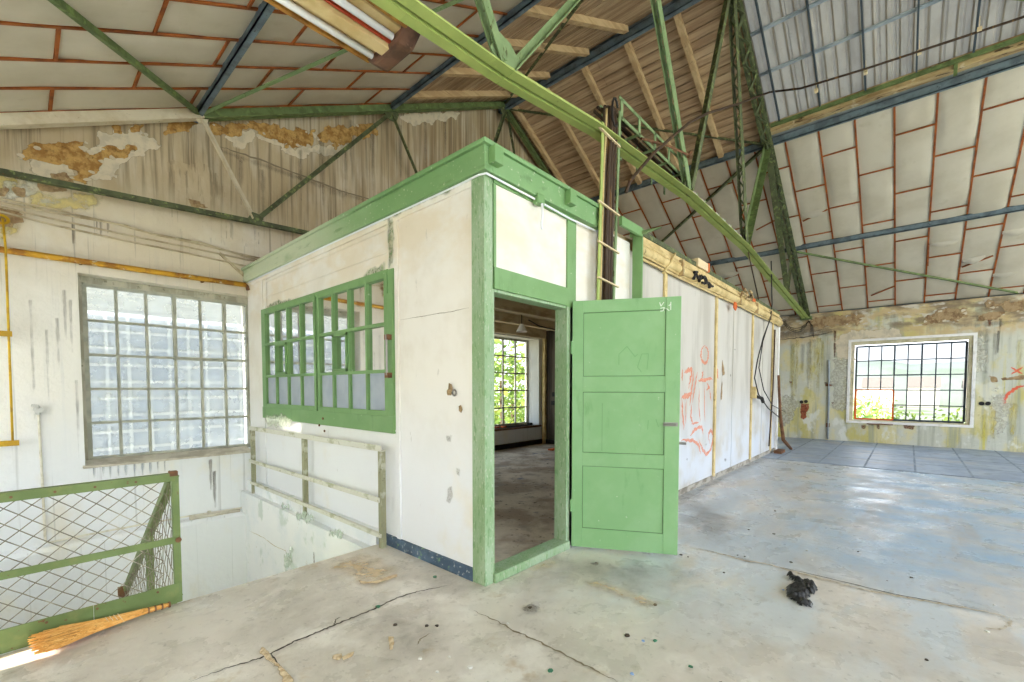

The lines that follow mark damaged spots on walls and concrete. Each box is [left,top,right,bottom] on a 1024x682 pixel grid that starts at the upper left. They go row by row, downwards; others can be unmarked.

flaking render [0,121,378,227]
flaking render [922,300,1024,325]
peeling [976,337,1024,382]
crack [198,585,448,679]
crack [476,611,615,680]